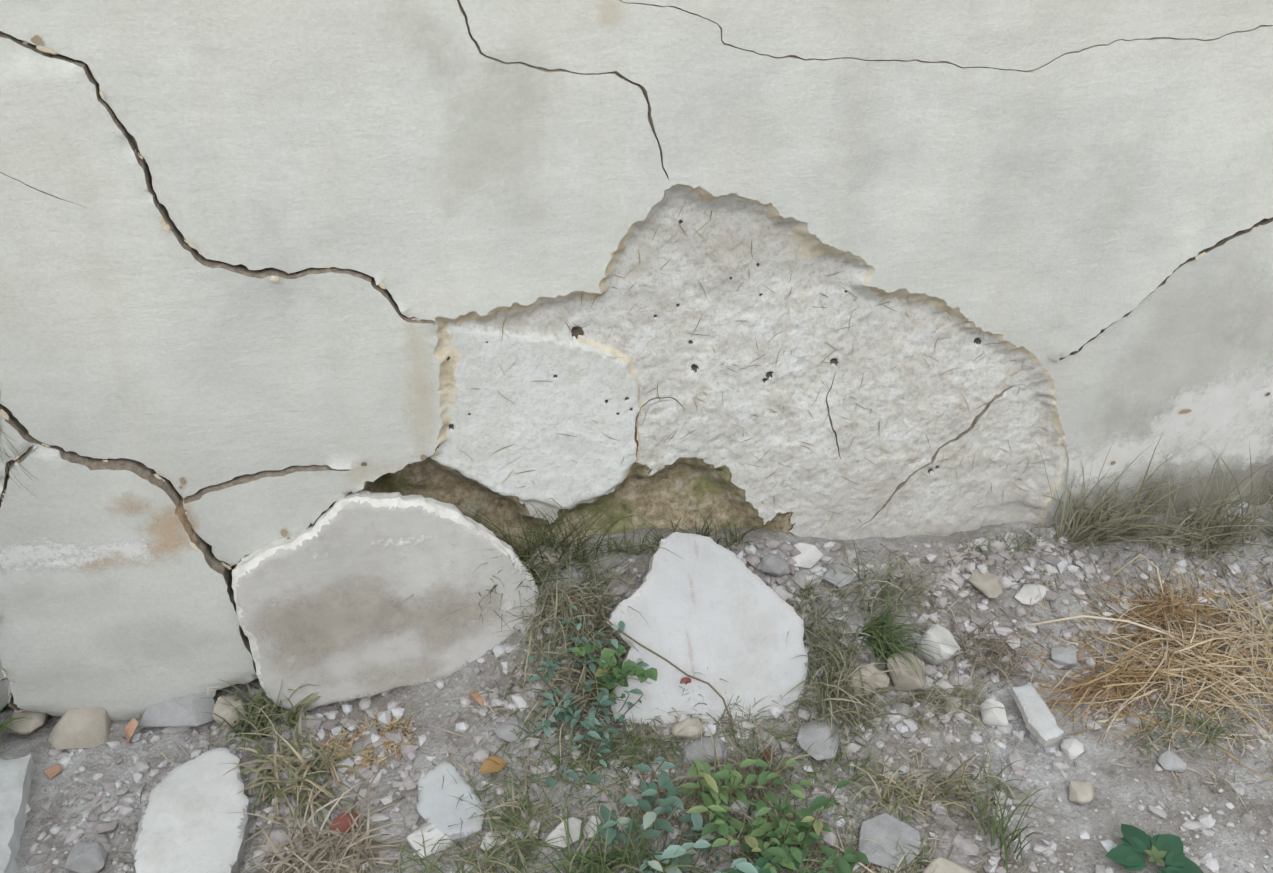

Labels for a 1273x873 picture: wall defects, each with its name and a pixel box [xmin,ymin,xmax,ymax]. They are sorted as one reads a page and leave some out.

crack [0,31,435,323]
crack [457,0,669,179]
crack [620,0,1273,73]
spalling [420,184,1068,540]
crack [1053,217,1273,362]
crack [0,404,365,673]
crack [858,386,1013,529]
crack [0,669,24,711]